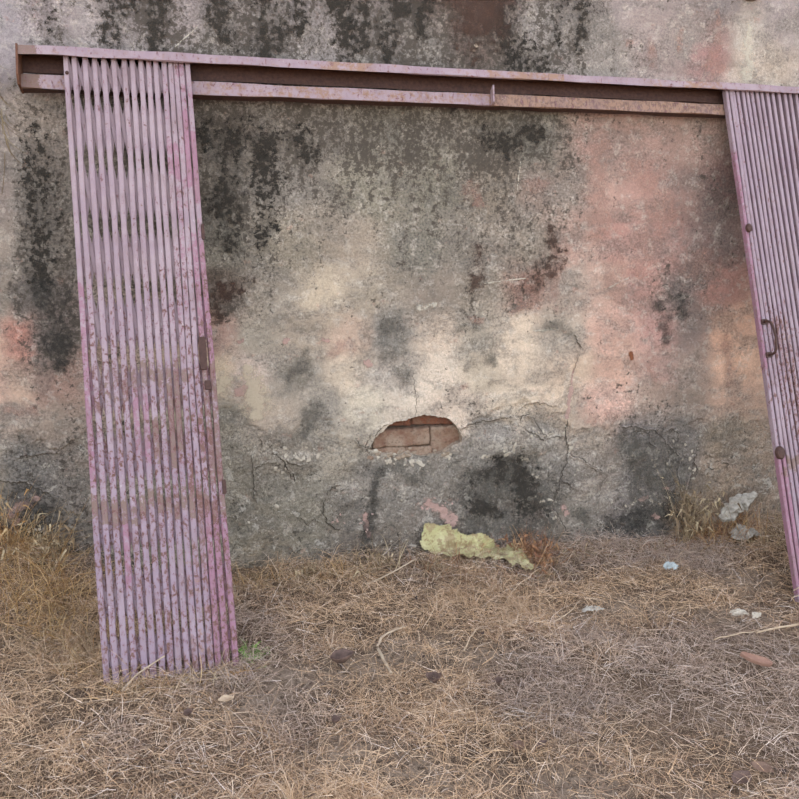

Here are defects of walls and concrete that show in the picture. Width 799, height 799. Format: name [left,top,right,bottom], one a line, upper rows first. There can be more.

water stain [92,0,197,52]
water stain [203,0,311,58]
water stain [327,0,551,73]
water stain [552,0,591,55]
water stain [195,114,321,262]
water stain [17,123,72,371]
water stain [467,222,572,295]
crack [251,438,306,503]
crack [300,482,342,530]
spalling [367,414,462,467]
water stain [421,448,585,535]
crack [459,400,608,540]